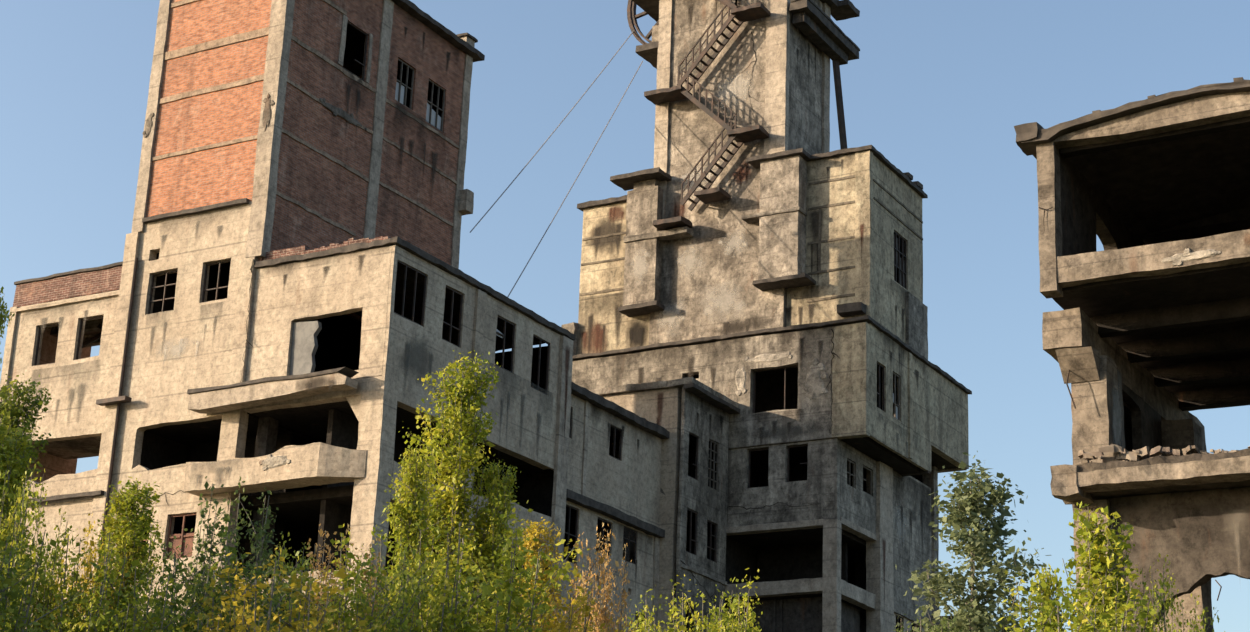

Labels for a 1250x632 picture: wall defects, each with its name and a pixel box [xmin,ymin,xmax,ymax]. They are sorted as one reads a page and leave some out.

leakage [588,293,646,357]